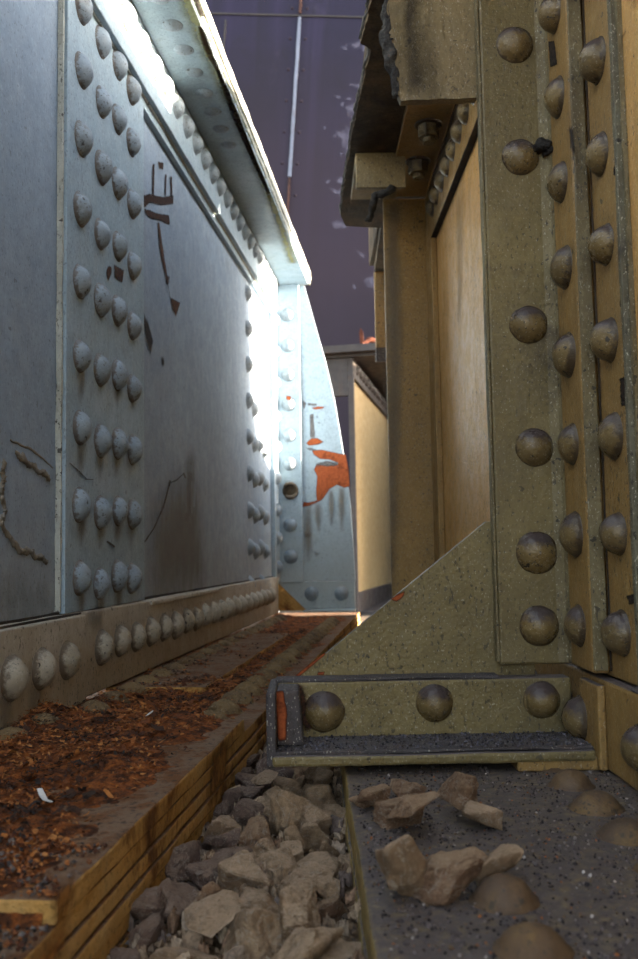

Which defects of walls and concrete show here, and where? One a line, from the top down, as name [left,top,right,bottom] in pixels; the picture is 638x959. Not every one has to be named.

rust [107,265,124,282]
rust [144,162,180,315]
peeling [302,401,350,507]